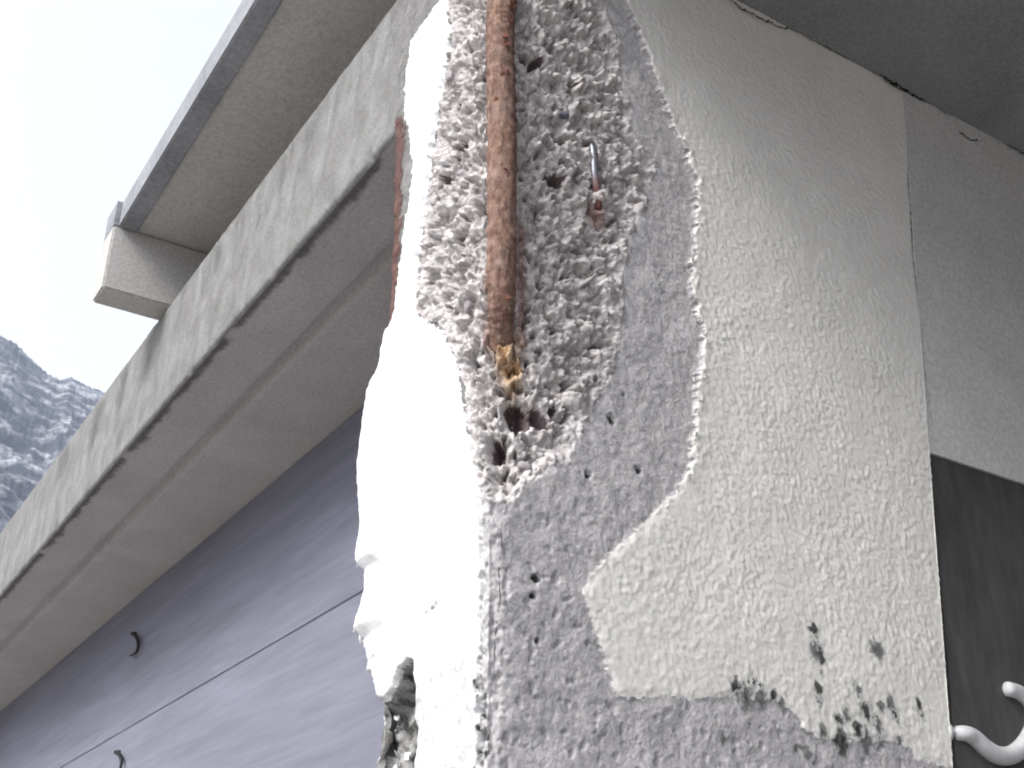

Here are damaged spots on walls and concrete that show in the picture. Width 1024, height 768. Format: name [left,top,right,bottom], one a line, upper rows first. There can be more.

corrosion [496,343,522,399]
peeling [415,0,952,768]
water stain [730,675,785,710]
water stain [808,622,826,703]
water stain [820,680,899,756]
water stain [870,637,883,659]